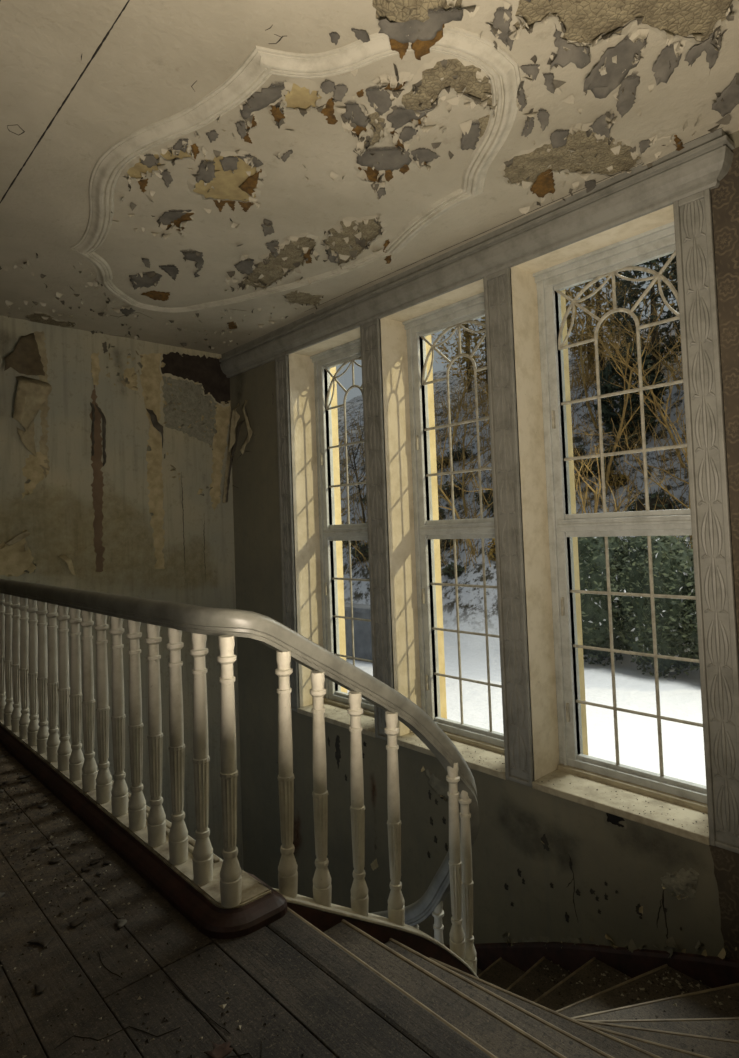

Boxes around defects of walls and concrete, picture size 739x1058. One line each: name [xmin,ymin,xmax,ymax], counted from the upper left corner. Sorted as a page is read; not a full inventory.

peeling [446,0,480,17]
flaking render [480,0,739,214]
flaking render [111,55,498,407]
peeling [0,253,141,340]
peeling [421,766,449,805]
flaking render [604,812,628,831]